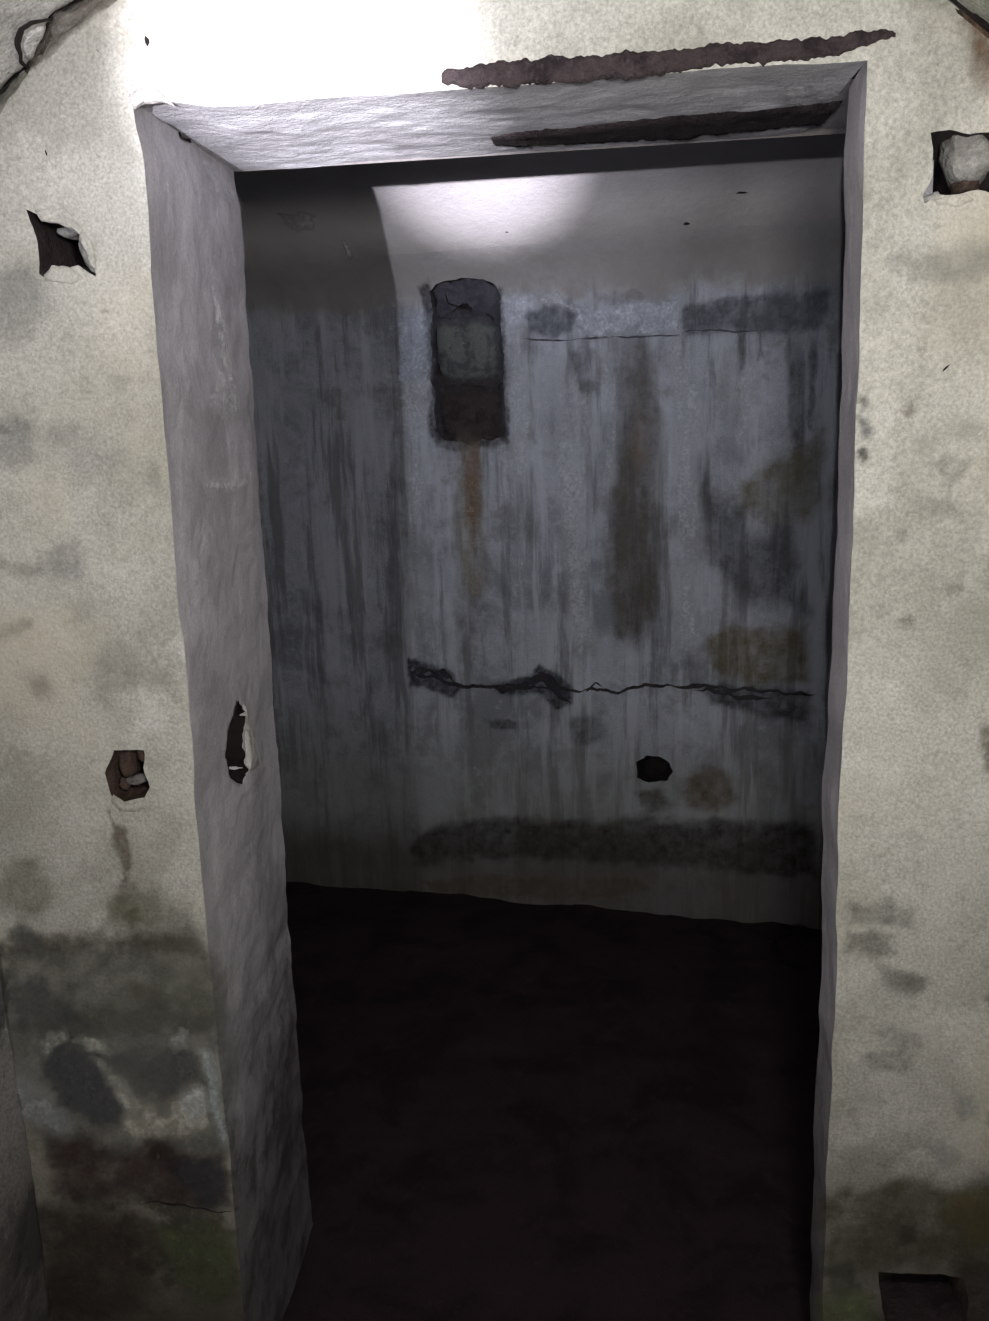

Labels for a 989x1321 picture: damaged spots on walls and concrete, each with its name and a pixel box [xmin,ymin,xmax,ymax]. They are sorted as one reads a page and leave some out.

crack [0,0,81,95]
rust [441,29,896,90]
crack [950,0,989,38]
hole [923,130,989,207]
hole [26,208,97,284]
water stain [507,292,827,341]
water stain [408,659,461,697]
water stain [496,666,571,709]
crack [410,668,816,703]
hole [105,750,150,812]
spalling [636,756,673,782]
water stain [0,933,227,1206]